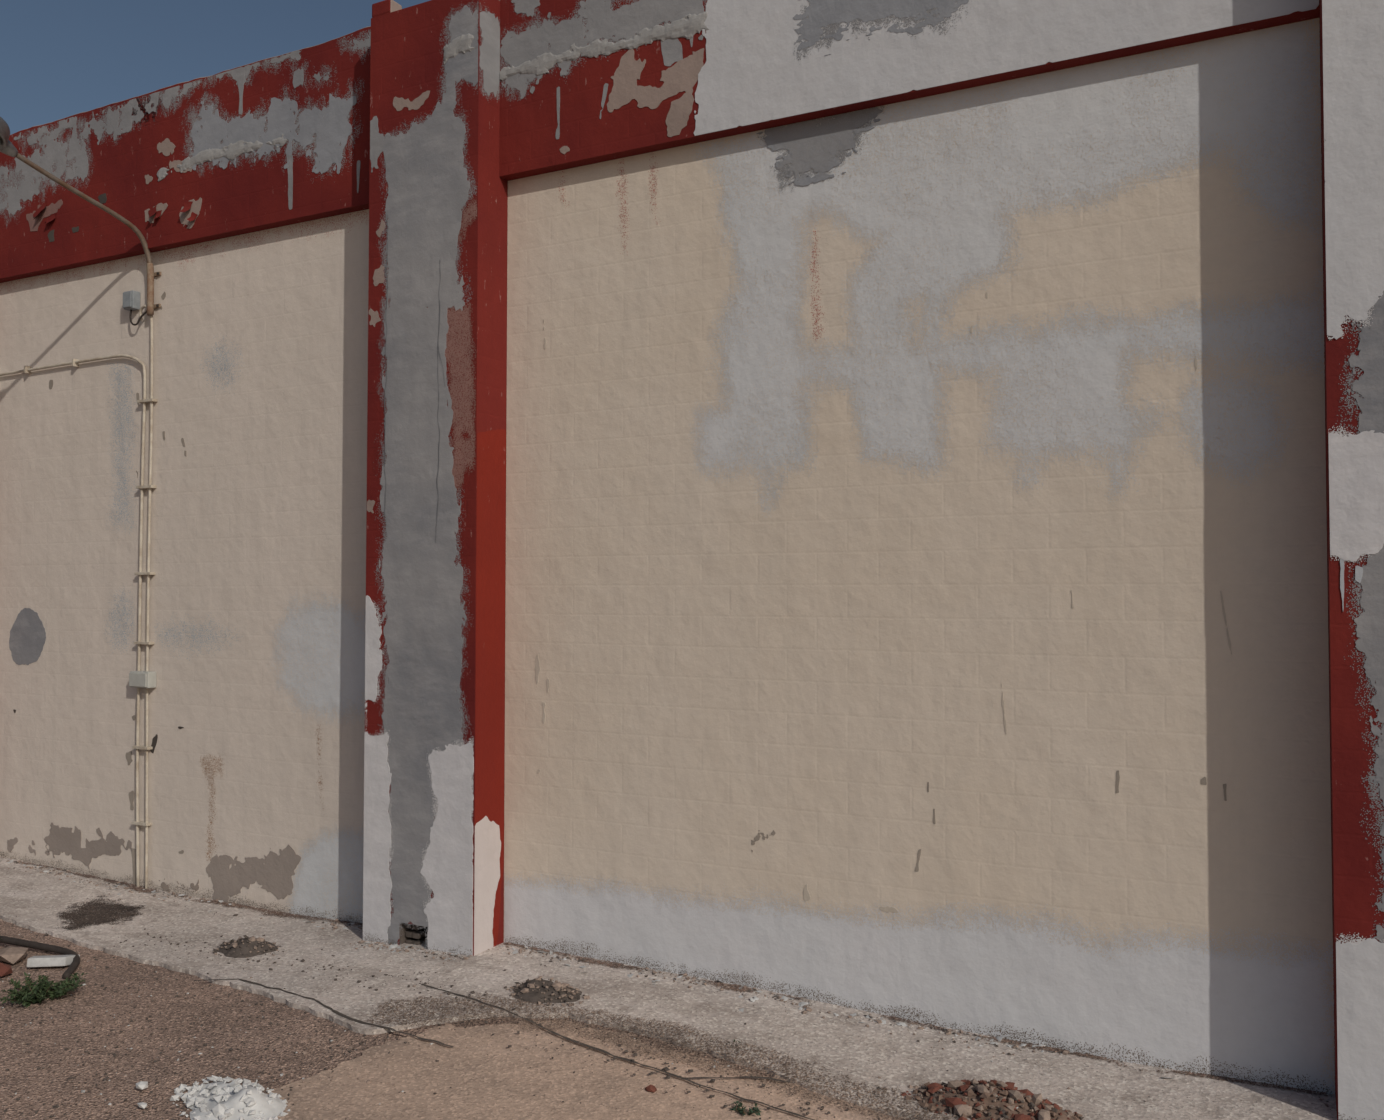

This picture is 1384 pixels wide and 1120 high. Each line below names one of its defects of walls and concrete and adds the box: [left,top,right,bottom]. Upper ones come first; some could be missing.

peeling [511,0,551,18]
peeling [132,29,371,121]
peeling [393,91,430,111]
peeling [607,35,704,137]
peeling [157,138,192,173]
peeling [26,200,63,242]
peeling [145,198,202,229]
peeling [373,265,385,286]
peeling [445,302,476,495]
peeling [365,595,385,712]
flaking render [7,822,136,884]
flaking render [159,844,301,903]